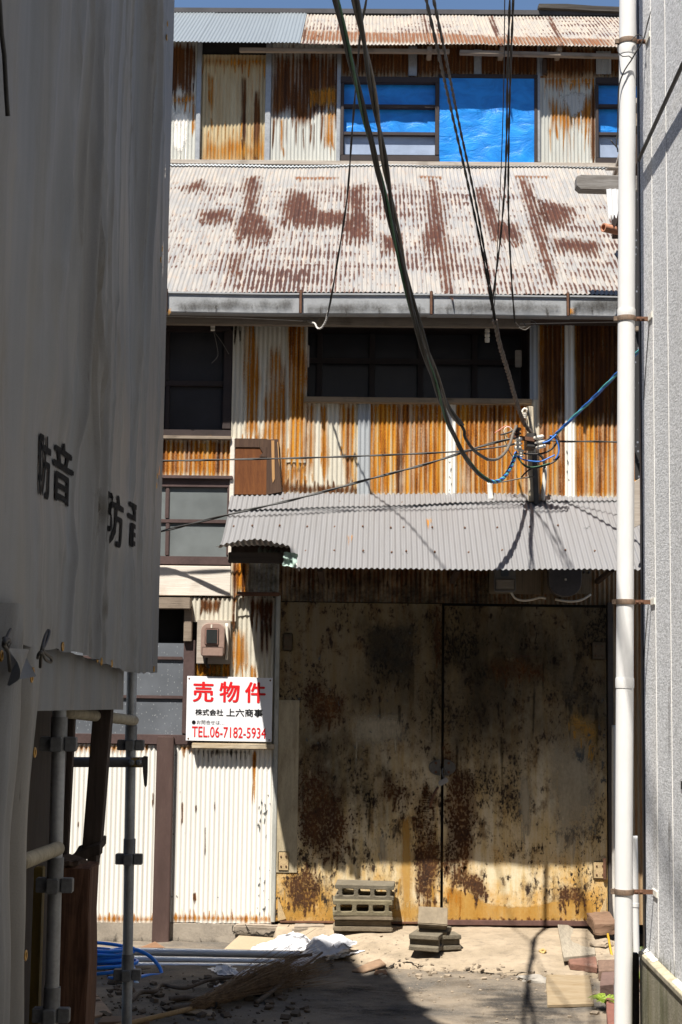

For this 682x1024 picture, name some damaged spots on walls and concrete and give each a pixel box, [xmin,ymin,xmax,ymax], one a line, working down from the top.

corrosion [169,15,619,163]
corrosion [181,178,210,195]
corrosion [196,176,403,278]
corrosion [419,176,454,300]
corrosion [475,175,604,285]
corrosion [159,440,230,476]
corrosion [234,326,357,494]
corrosion [370,325,618,497]
corrosion [195,563,273,678]
corrosion [286,746,362,919]
corrosion [380,743,587,921]
corrosion [173,893,270,923]